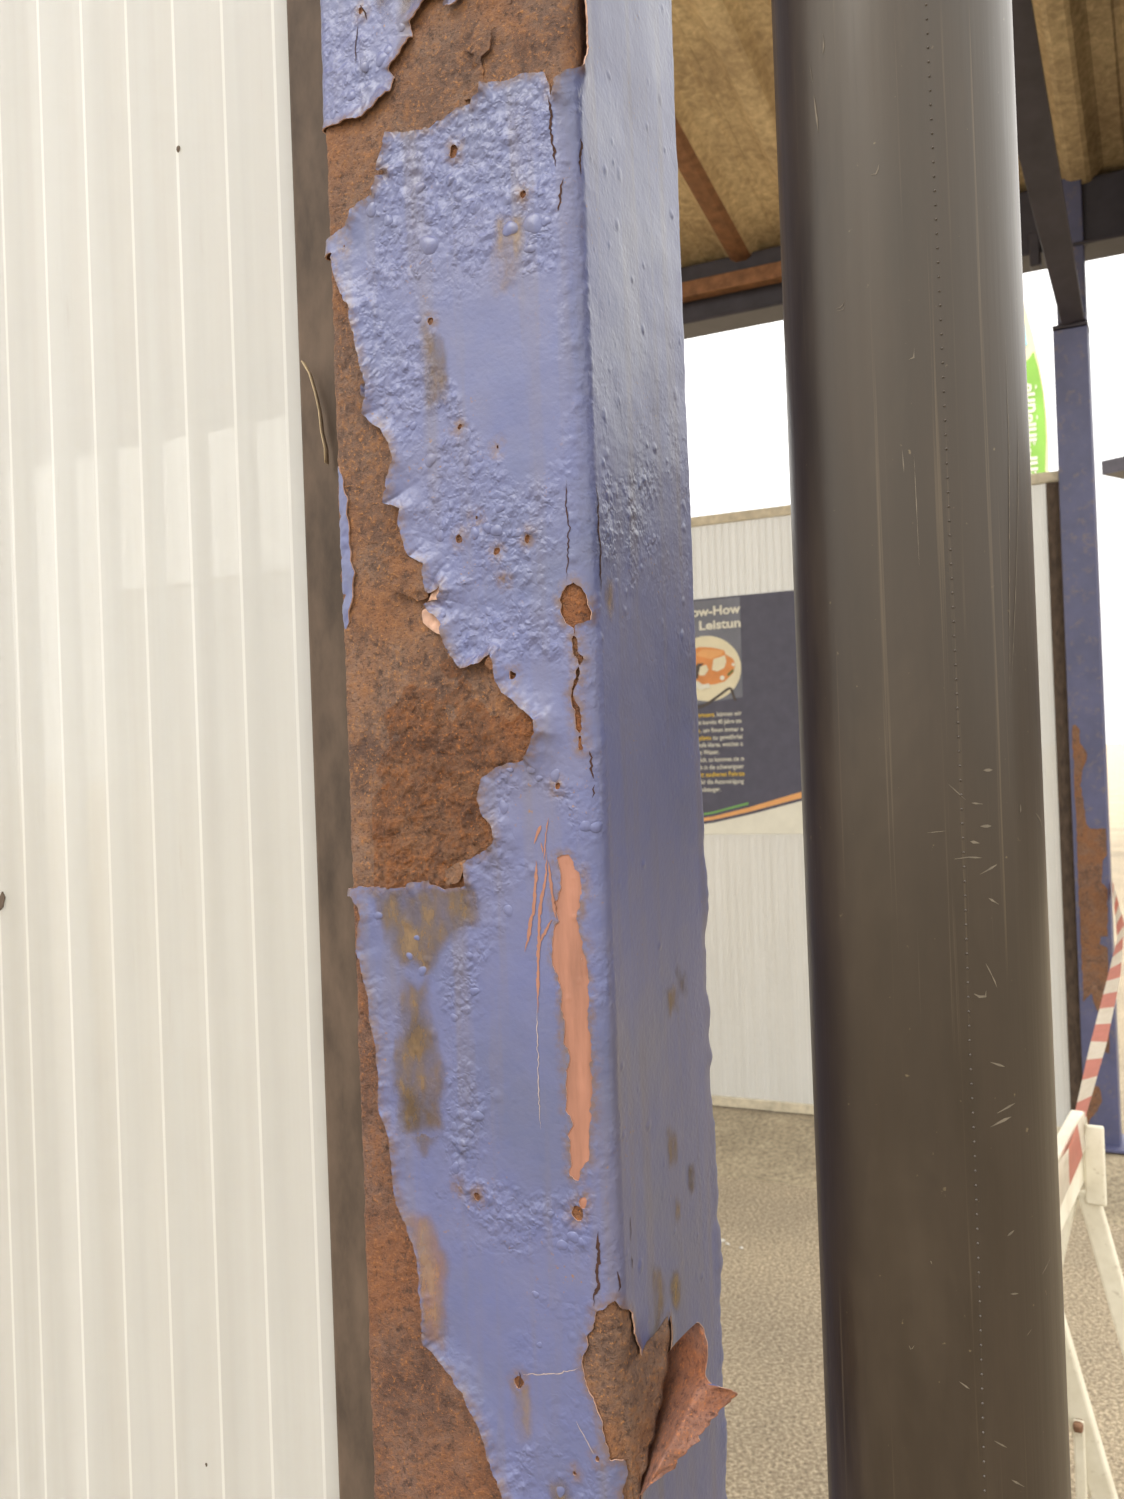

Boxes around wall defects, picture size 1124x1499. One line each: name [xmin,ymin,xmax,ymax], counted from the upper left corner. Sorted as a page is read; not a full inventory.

peeling [301,0,581,1499]
peeling [560,583,591,750]
rust [382,891,473,972]
rust [398,987,439,1136]
spalling [572,1197,587,1220]
peeling [582,1301,738,1499]